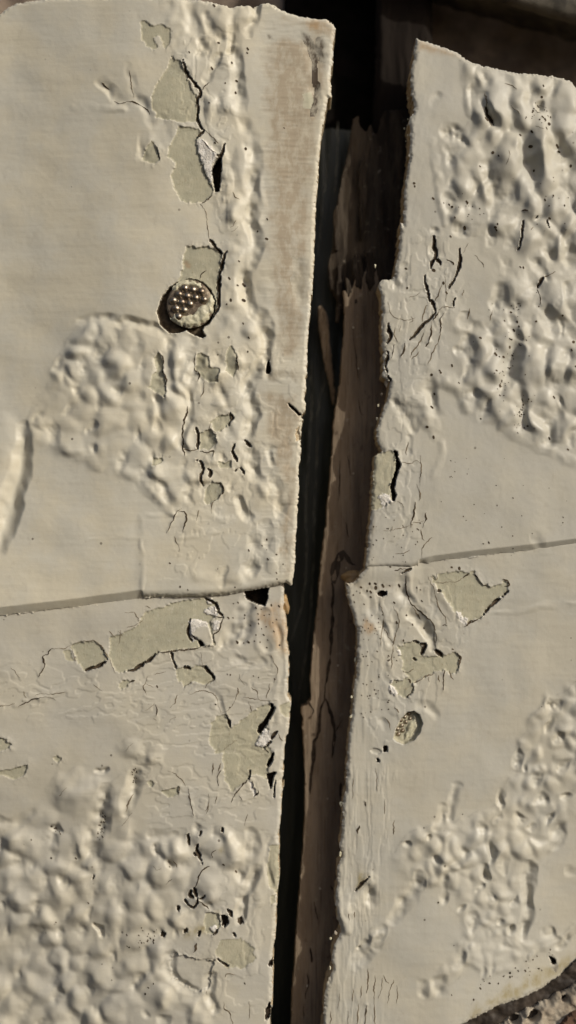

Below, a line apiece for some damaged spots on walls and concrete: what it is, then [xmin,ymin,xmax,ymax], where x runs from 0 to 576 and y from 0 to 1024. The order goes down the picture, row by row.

peeling [142,126,222,203]
peeling [157,246,222,338]
crack [385,236,492,381]
peeling [371,451,400,510]
peeling [63,596,220,689]
spalling [245,587,269,606]
crack [307,583,341,795]
peeling [209,702,291,797]
crack [0,599,278,1023]
crack [339,773,395,835]
crack [314,877,369,920]
crack [330,971,398,1024]